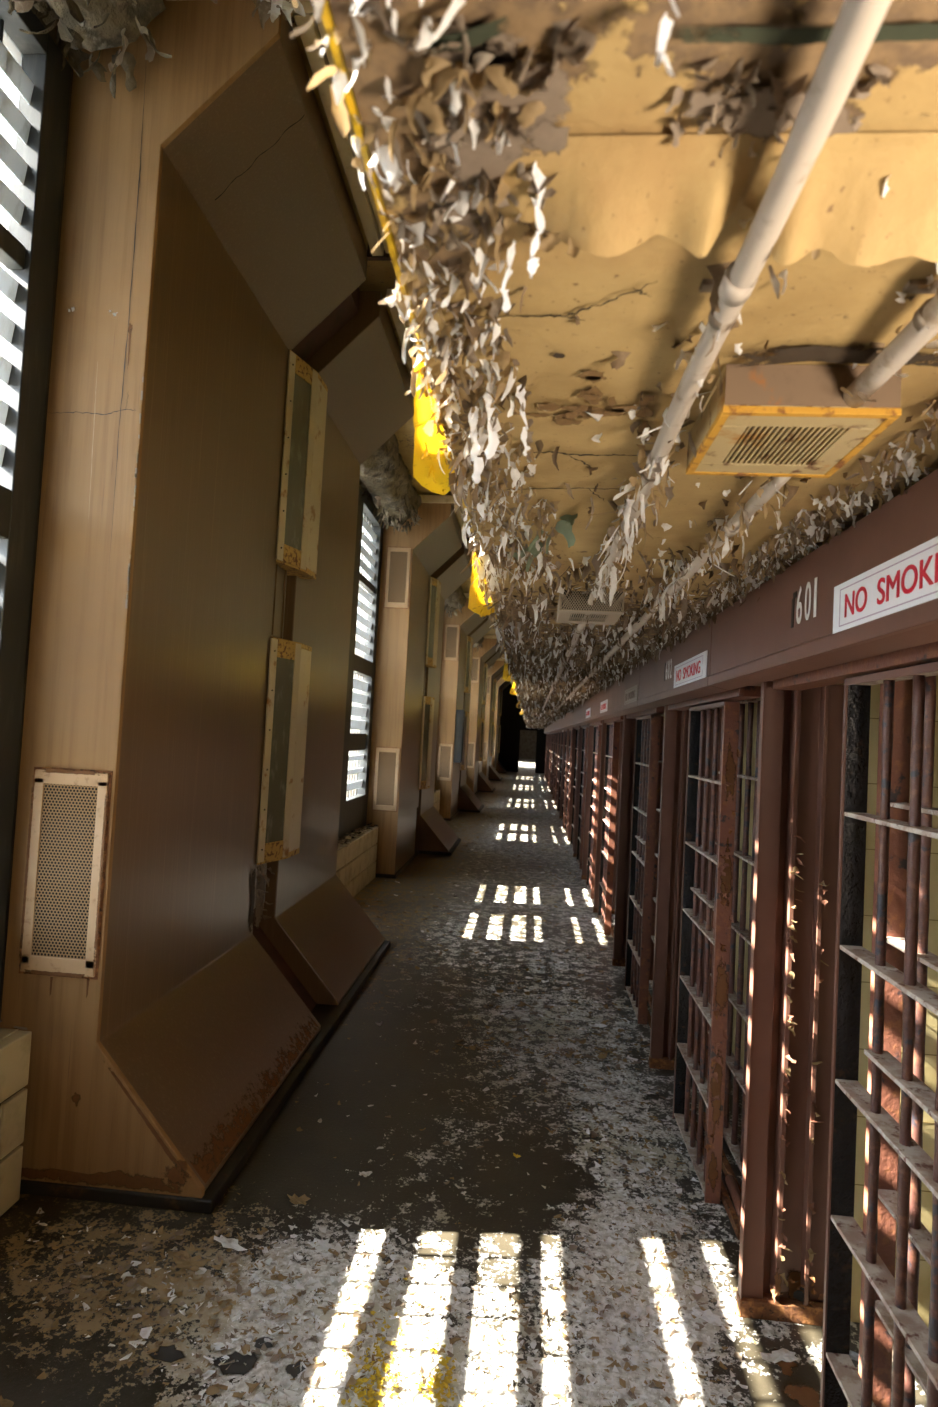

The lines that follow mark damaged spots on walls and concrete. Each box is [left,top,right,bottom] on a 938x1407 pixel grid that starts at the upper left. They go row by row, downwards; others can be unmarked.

crack [466,281,658,321]
peeling [252,0,938,729]
rust [784,1271,801,1299]